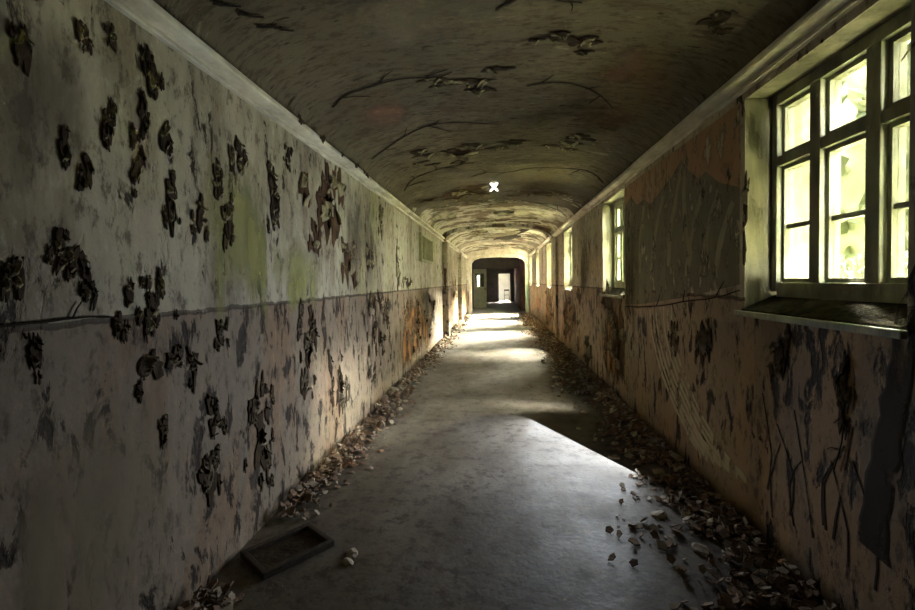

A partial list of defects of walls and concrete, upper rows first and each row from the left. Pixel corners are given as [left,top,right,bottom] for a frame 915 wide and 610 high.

peeling [528,31,604,56]
peeling [59,125,95,192]
peeling [102,96,118,152]
peeling [129,44,165,198]
peeling [160,120,174,157]
peeling [163,135,249,253]
spalling [267,143,374,290]
peeling [421,184,491,209]
spalling [459,210,541,249]
peeling [297,298,349,442]
spalling [367,289,392,387]